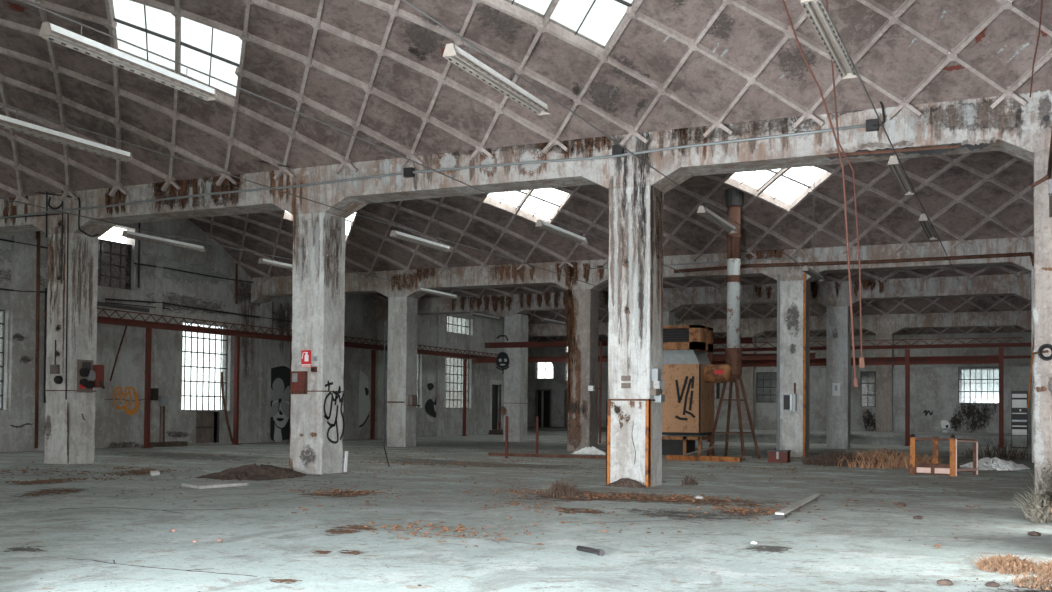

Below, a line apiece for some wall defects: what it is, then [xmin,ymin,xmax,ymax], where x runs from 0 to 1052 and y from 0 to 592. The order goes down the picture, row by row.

damp [856,90,1052,144]
damp [40,223,93,335]
rust [152,174,240,210]
rust [391,268,435,291]
damp [380,116,840,369]
rust [452,261,609,431]
damp [1033,349,1045,479]